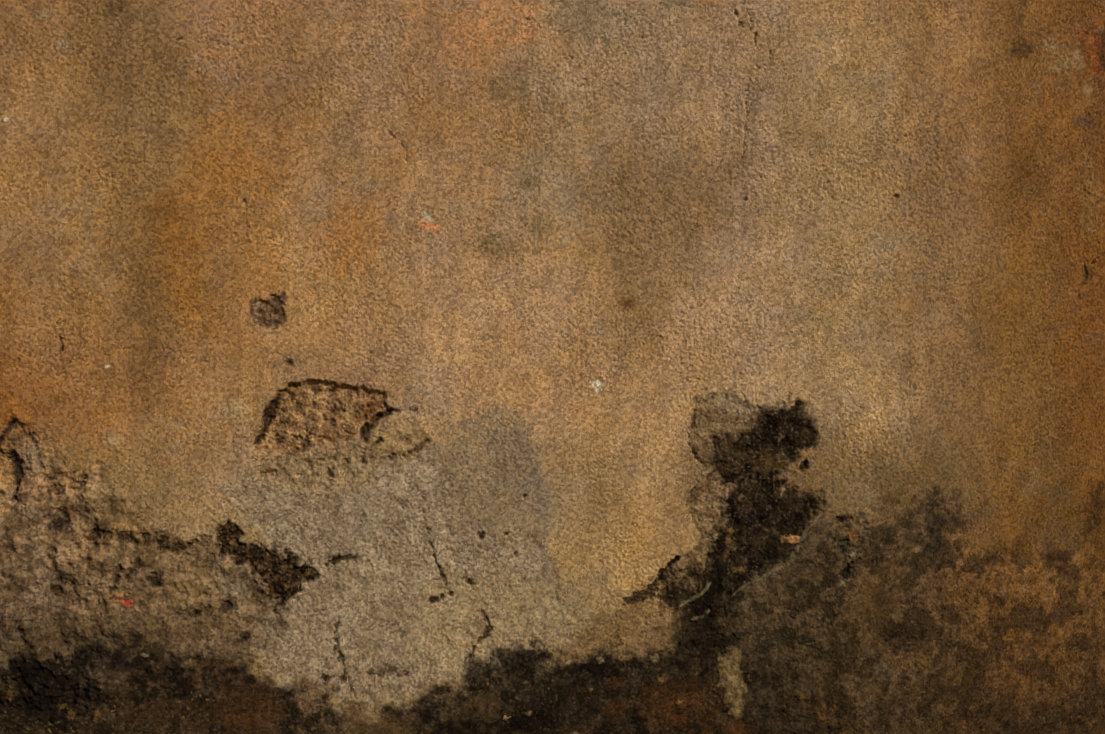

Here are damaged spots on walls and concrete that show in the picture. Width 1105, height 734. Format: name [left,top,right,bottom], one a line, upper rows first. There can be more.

peeling [438,0,542,71]
spalling [248,291,288,330]
peeling [0,345,604,710]
leakage [0,470,1105,734]
spalling [621,389,877,719]